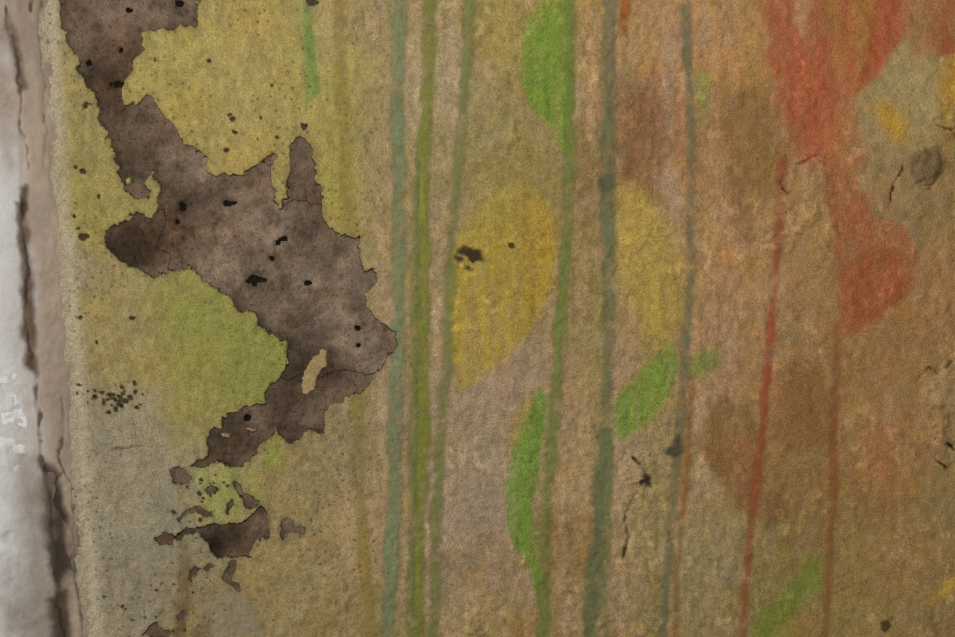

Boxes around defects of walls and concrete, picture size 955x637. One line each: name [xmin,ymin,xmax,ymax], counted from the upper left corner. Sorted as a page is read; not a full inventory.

flaking render [61,0,398,594]